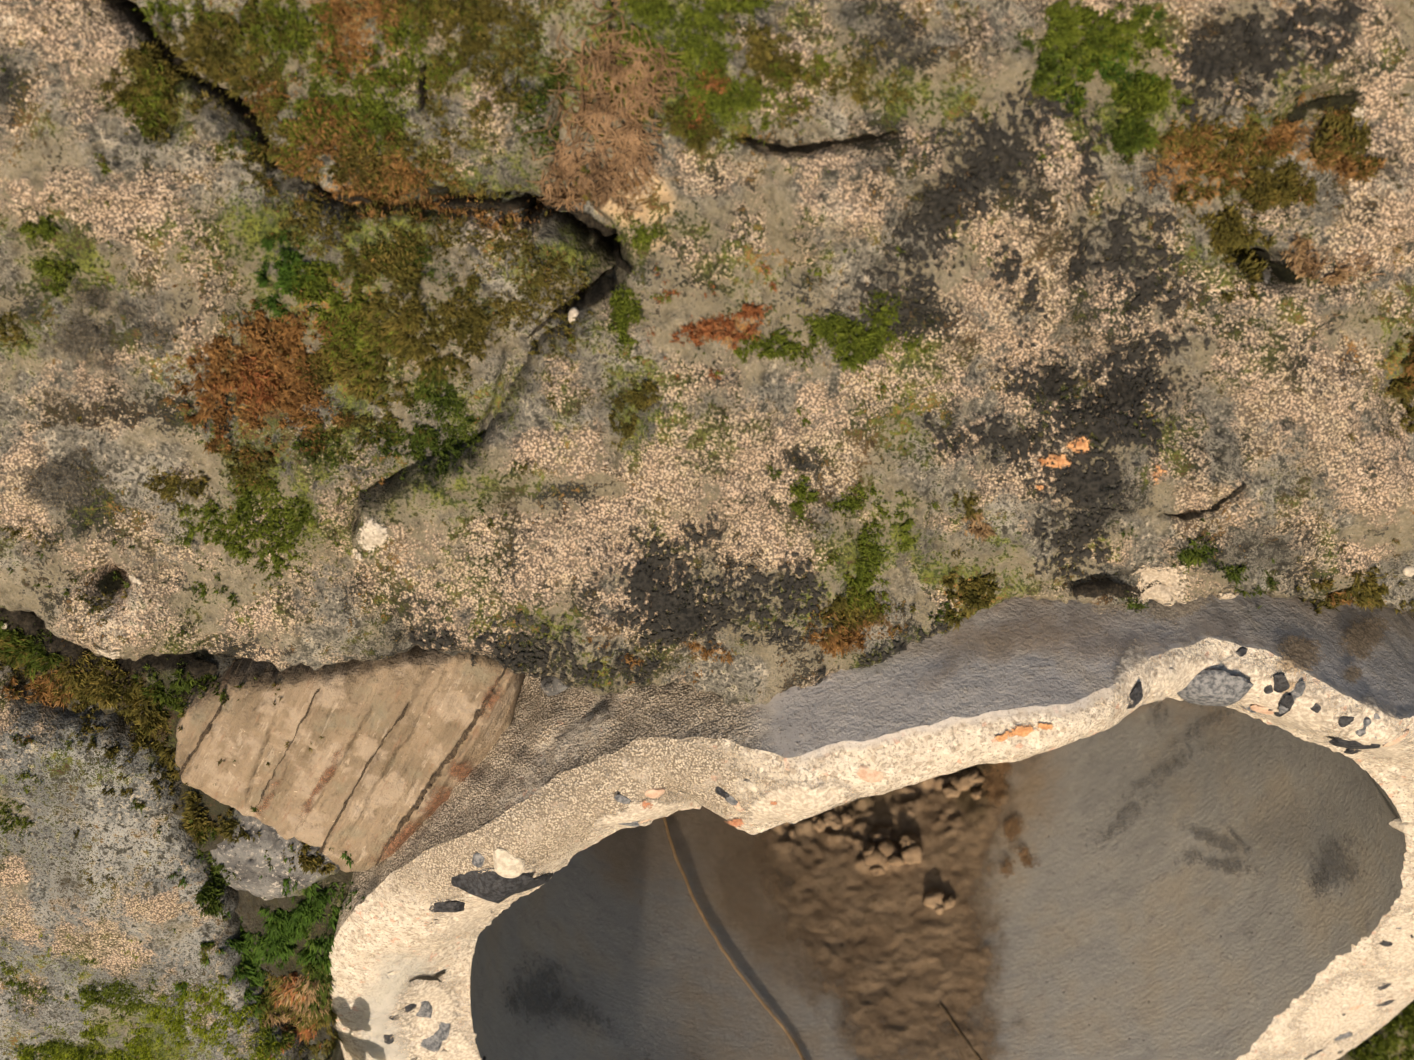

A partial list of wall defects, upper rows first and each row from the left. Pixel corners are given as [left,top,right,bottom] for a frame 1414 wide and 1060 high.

crack [418,69,427,110]
crack [742,130,898,154]